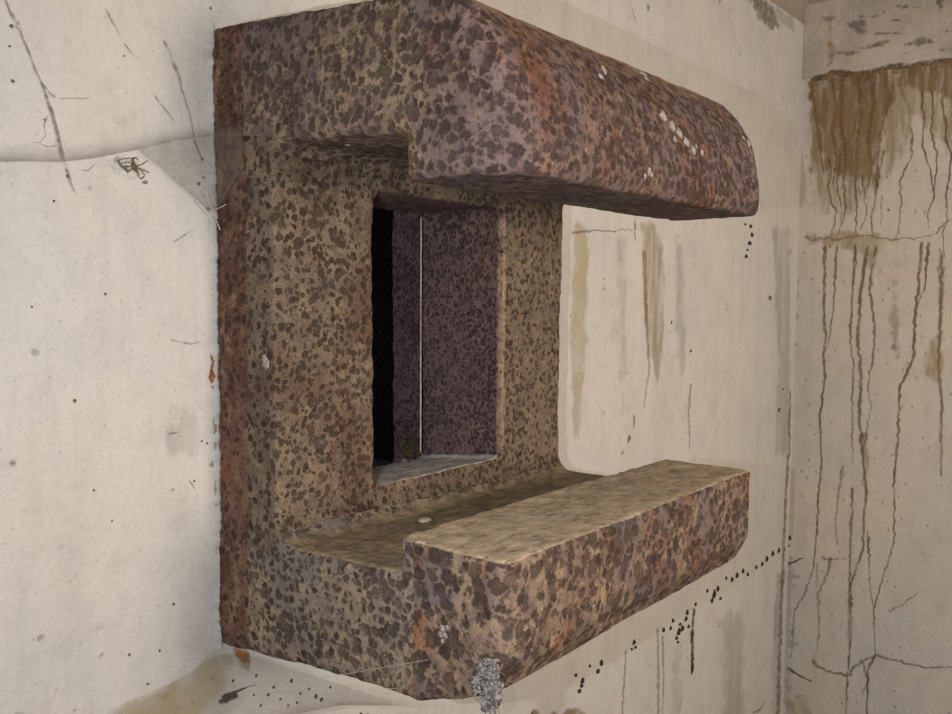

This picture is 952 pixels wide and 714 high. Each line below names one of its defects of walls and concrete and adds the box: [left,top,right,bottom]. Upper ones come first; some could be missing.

water stain [808,66,952,256]
crack [776,393,949,714]